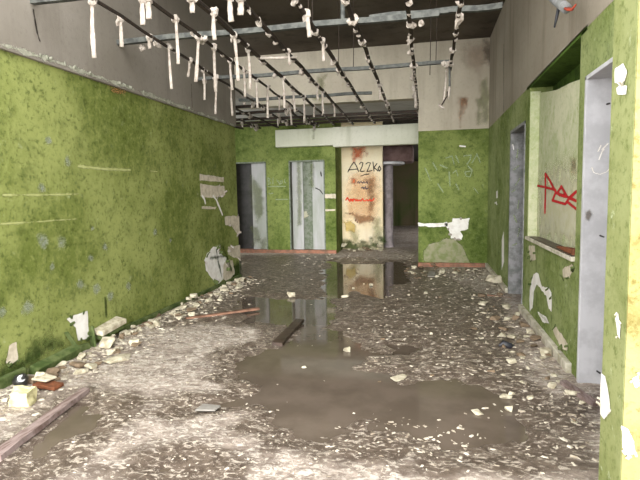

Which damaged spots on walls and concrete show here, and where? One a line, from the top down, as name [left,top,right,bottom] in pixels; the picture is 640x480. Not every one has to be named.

peeling [614,64,627,95]
peeling [200,174,241,237]
peeling [418,217,470,241]
peeling [204,244,241,284]
peeling [67,310,92,342]
peeling [528,273,568,351]
peeling [6,342,20,367]
peeling [596,373,611,419]
peeling [621,426,638,460]